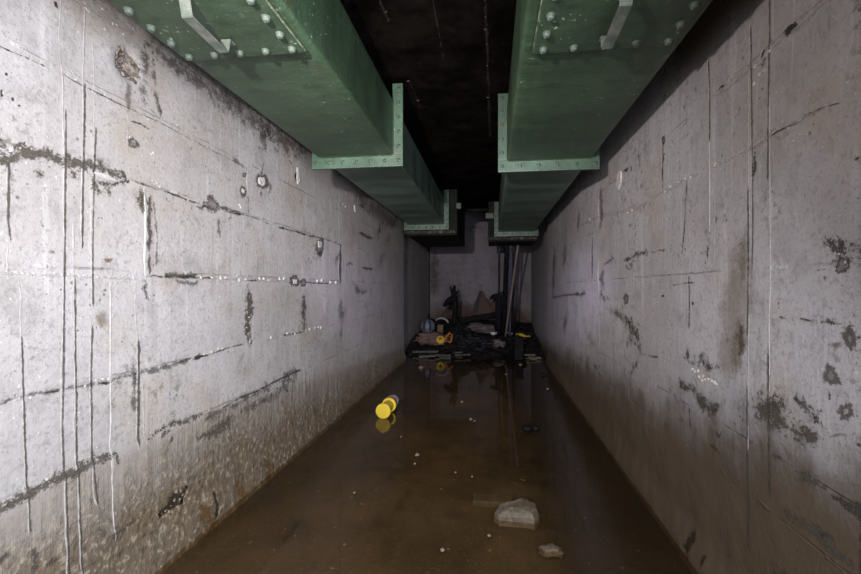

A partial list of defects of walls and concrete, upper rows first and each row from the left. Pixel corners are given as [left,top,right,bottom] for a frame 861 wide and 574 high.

spalling [103,22,162,119]
leakage [145,40,312,164]
leakage [0,0,133,574]
leakage [131,186,301,449]
leakage [746,0,828,548]